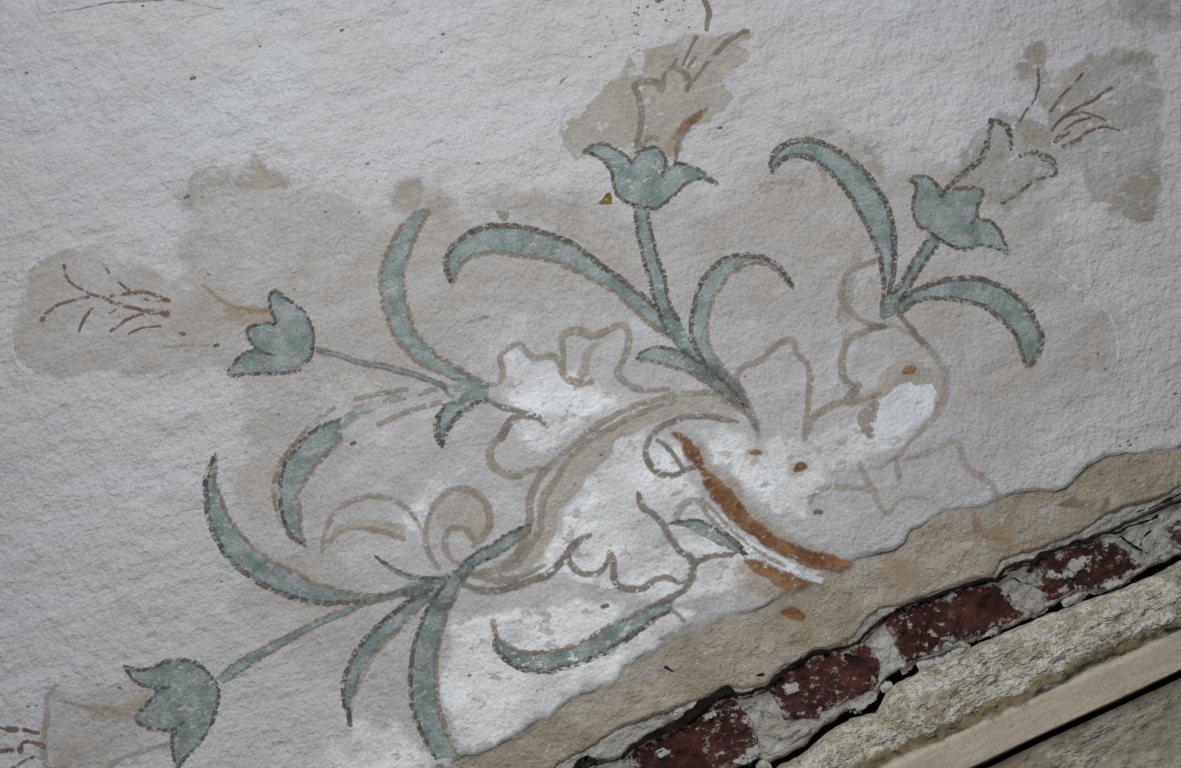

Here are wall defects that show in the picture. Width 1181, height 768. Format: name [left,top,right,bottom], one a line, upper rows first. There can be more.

leakage [567,29,749,158]
leakage [1019,42,1046,68]
flaking render [294,296,1181,768]
crack [573,492,1181,768]